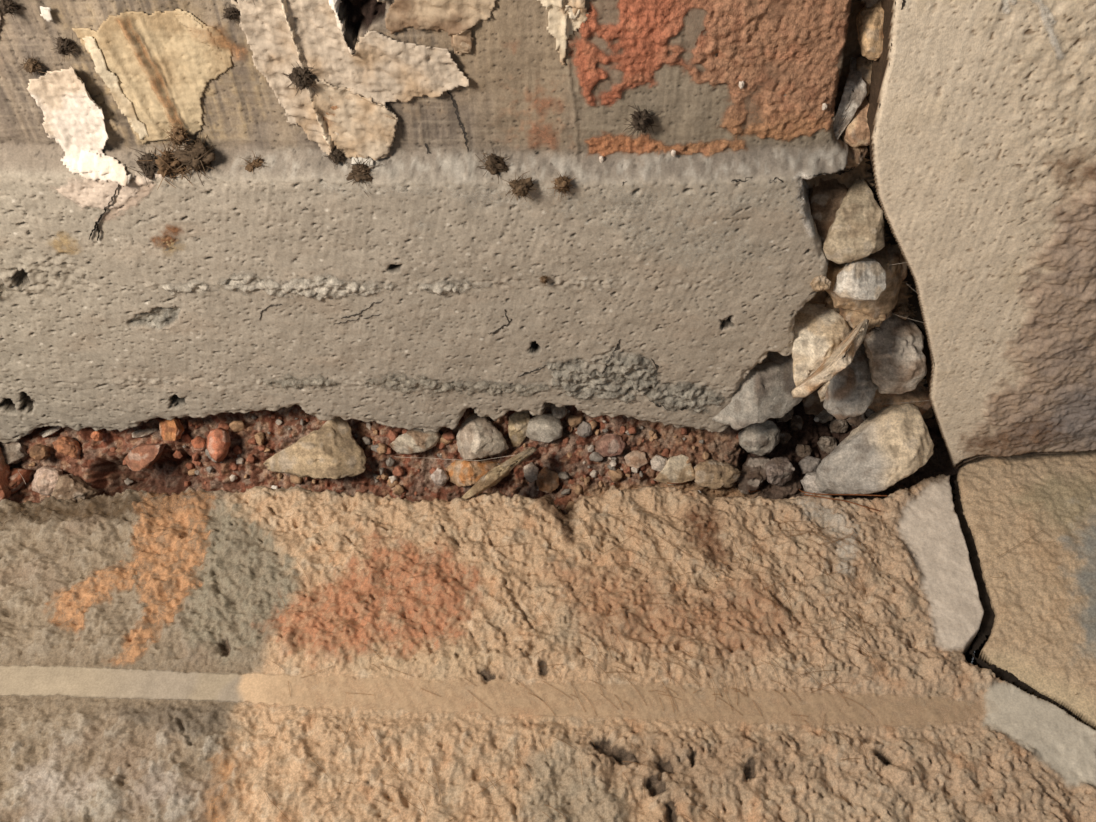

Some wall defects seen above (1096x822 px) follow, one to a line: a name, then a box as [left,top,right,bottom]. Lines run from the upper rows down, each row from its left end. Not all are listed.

peeling [40,6,53,22]
peeling [26,66,154,220]
peeling [72,9,233,144]
peeling [231,0,496,166]
peeling [585,133,746,163]
peeling [566,383,725,414]
spalling [654,454,701,493]
crack [952,480,1093,729]